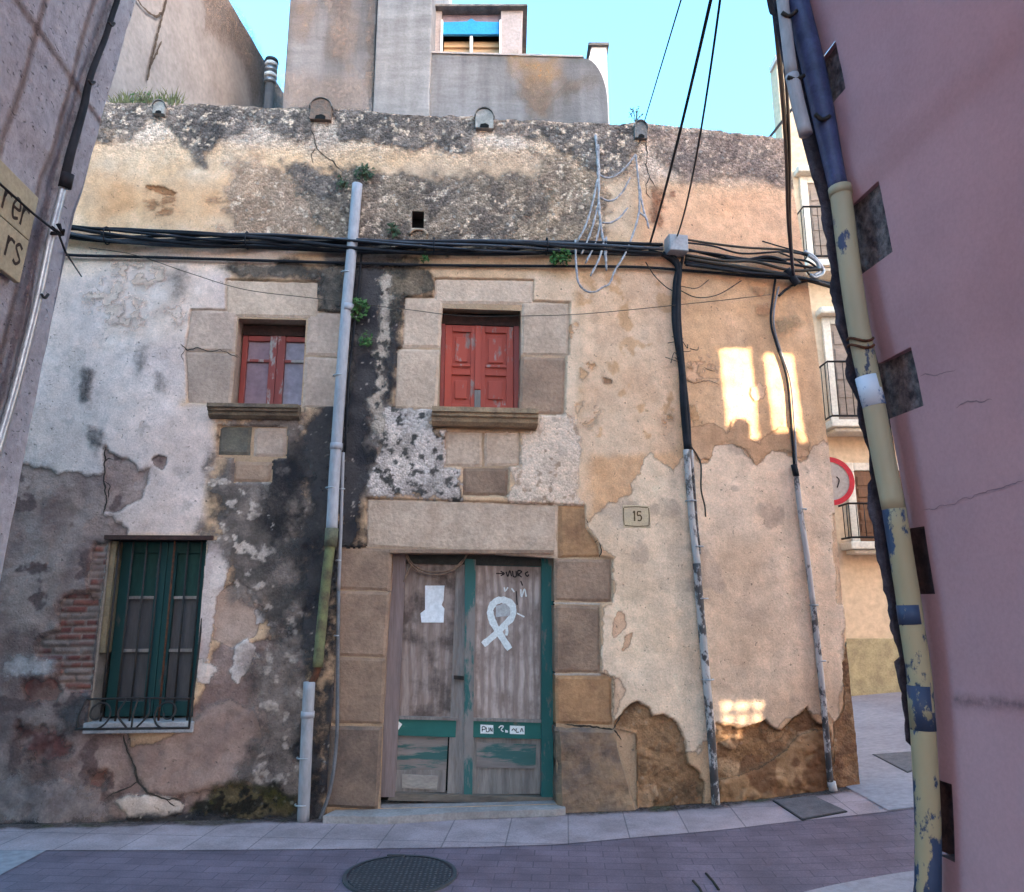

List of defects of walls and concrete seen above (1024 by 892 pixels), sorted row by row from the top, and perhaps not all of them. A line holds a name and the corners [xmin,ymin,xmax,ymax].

flaking render [146,185,176,215]
crack [181,344,238,362]
flaking render [686,357,718,382]
crack [103,449,113,513]
damp [0,159,553,824]
flaking render [0,447,212,822]
flaking render [192,585,277,731]
flaking render [587,405,860,808]
crack [105,735,182,807]